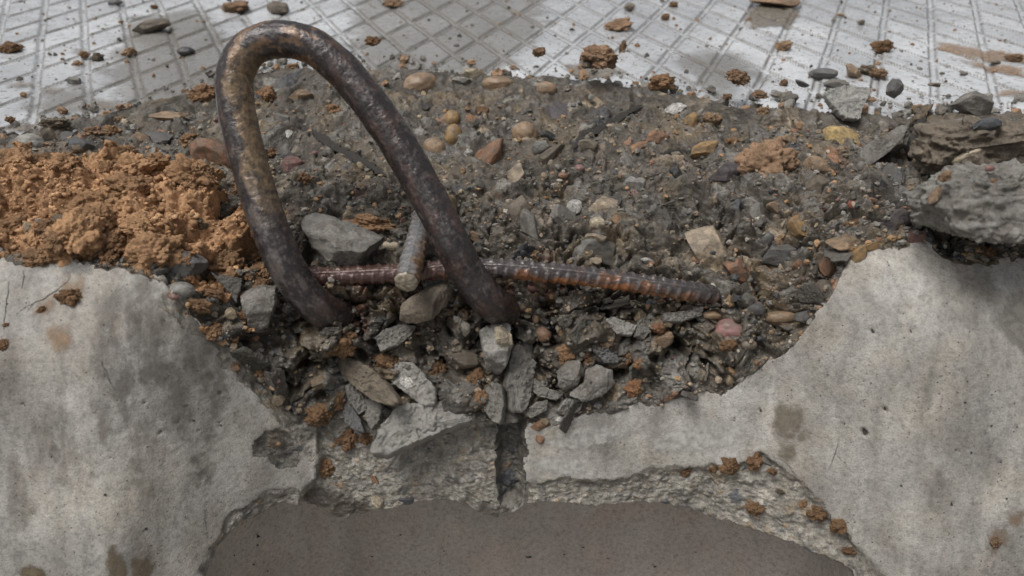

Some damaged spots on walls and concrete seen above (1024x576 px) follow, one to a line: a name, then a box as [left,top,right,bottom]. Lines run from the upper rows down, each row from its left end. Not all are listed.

spalling [64,77,81,85]
spalling [0,83,241,230]
spalling [88,258,187,288]
spalling [158,66,1024,576]